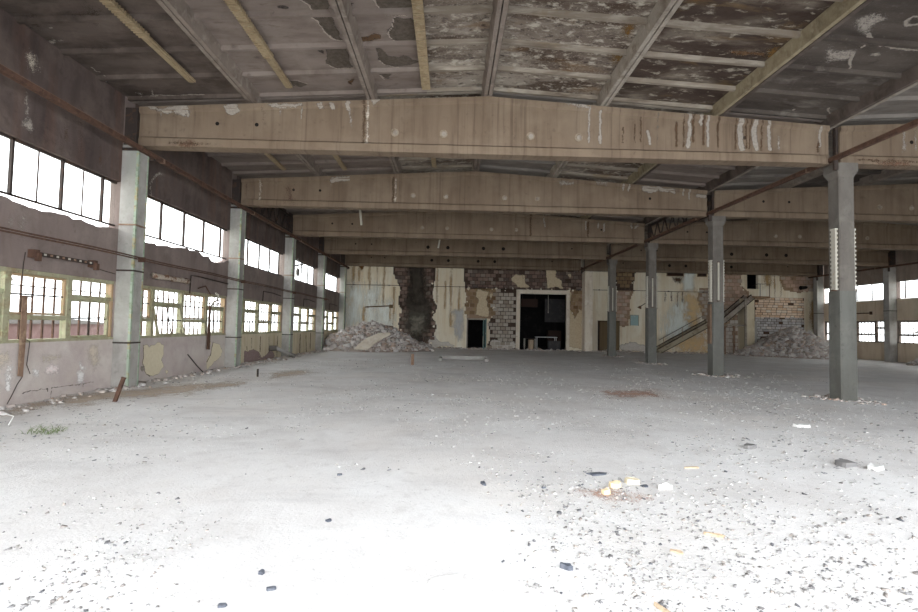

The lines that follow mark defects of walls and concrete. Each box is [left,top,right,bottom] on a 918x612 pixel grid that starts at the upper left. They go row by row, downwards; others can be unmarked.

peeling [361,0,419,80]
efflorescence [826,13,918,69]
efflorescence [567,103,602,144]
efflorescence [675,113,721,148]
efflorescence [734,118,780,151]
spalling [393,267,454,348]
spalling [464,267,584,349]
spalling [616,272,636,327]
spalling [778,275,813,293]
peeling [141,342,168,377]